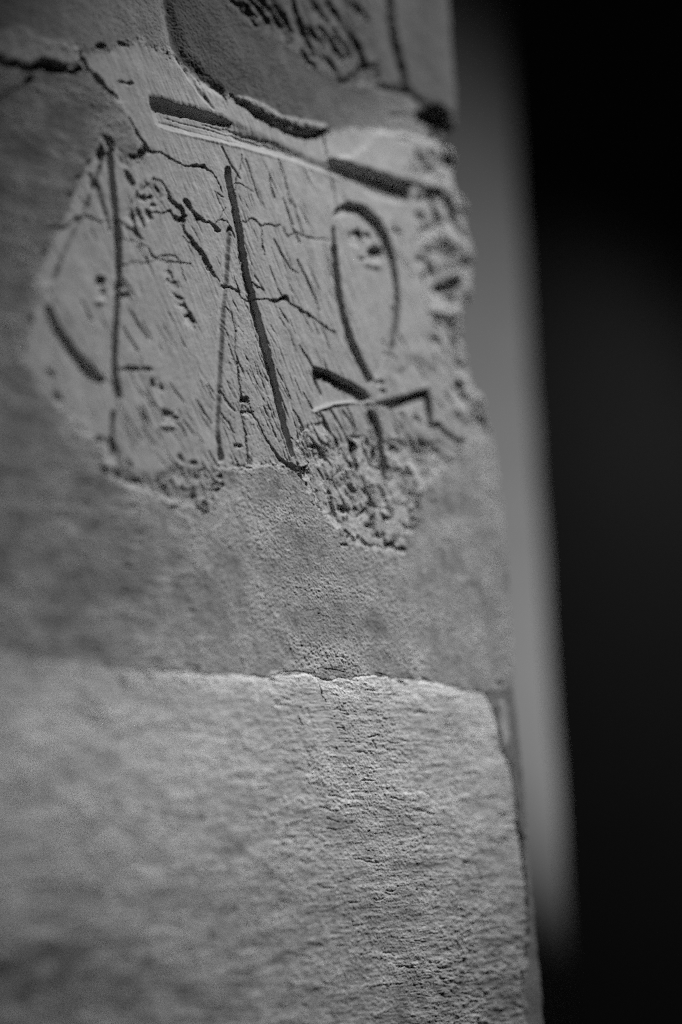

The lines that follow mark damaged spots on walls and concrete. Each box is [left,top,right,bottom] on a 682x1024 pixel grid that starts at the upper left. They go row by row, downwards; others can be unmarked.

crack [0,50,337,487]
spalling [289,411,444,554]